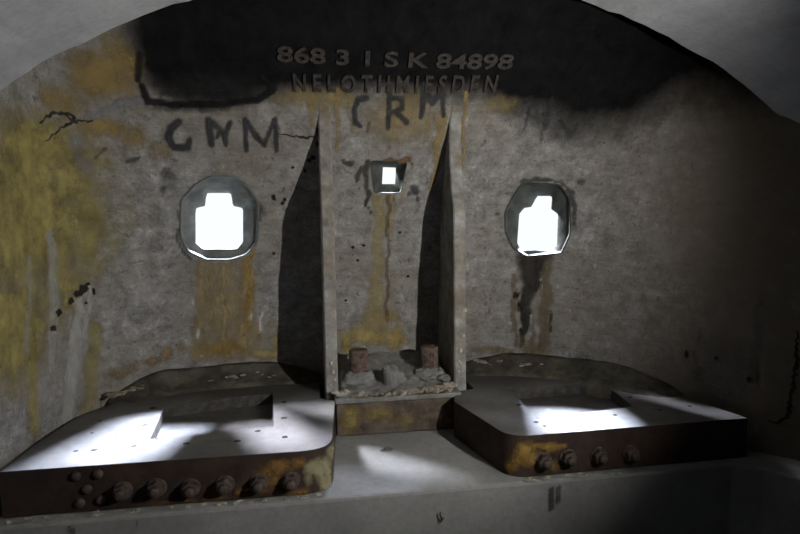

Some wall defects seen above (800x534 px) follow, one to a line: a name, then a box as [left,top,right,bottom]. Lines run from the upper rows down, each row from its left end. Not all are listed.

crack [39,111,93,142]
crack [279,132,315,140]
water stain [342,160,372,214]
water stain [518,253,551,348]
spalling [330,348,466,397]
crack [768,330,800,425]
rust [262,457,308,496]
rust [506,443,566,471]